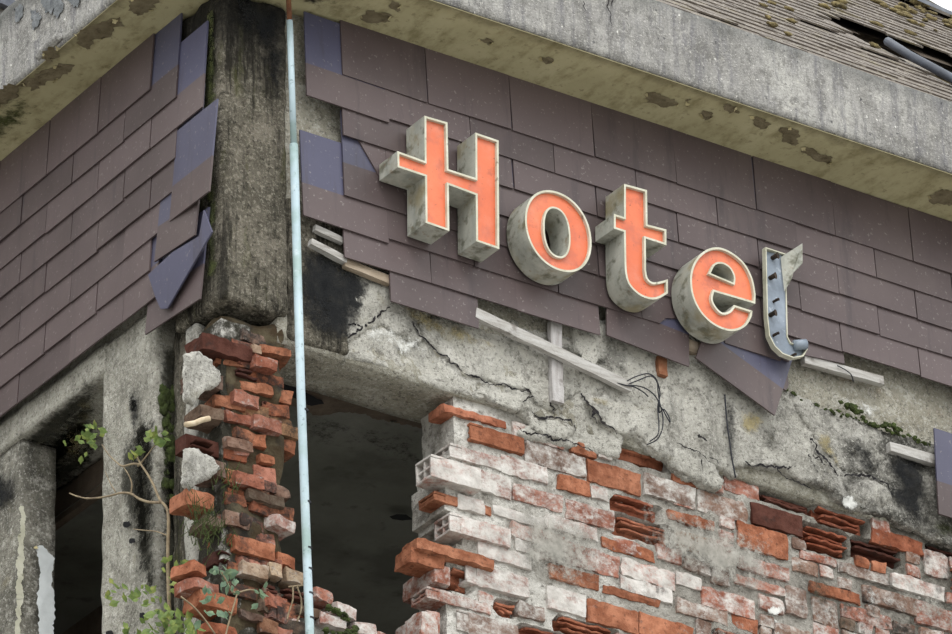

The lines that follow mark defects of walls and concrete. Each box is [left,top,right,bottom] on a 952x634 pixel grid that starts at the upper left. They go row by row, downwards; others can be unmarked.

damp [0,103,31,135]
damp [301,247,369,338]
crack [348,307,390,338]
peeling [182,351,221,407]
crack [413,321,617,452]
damp [0,477,13,506]
peeling [180,448,220,491]
crack [679,434,720,469]
crack [745,438,892,492]
damp [15,506,26,634]